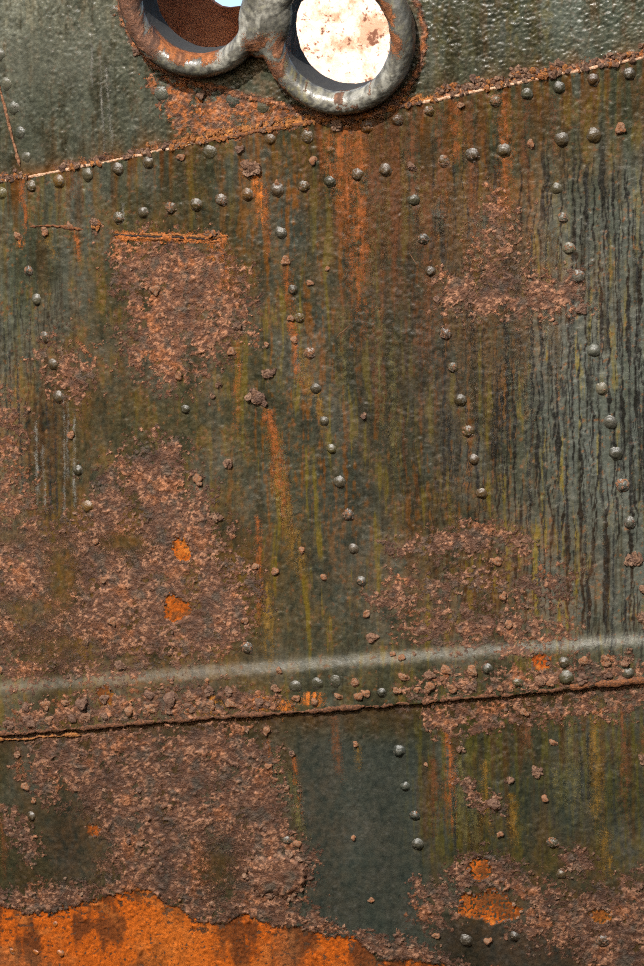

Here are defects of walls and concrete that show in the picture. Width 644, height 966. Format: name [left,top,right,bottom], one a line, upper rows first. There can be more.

corrosion [16,160,328,591]
peeling [163,592,192,623]
peeling [171,534,194,564]
corrosion [0,382,644,966]
corrosion [119,0,604,500]
peeling [458,857,524,926]